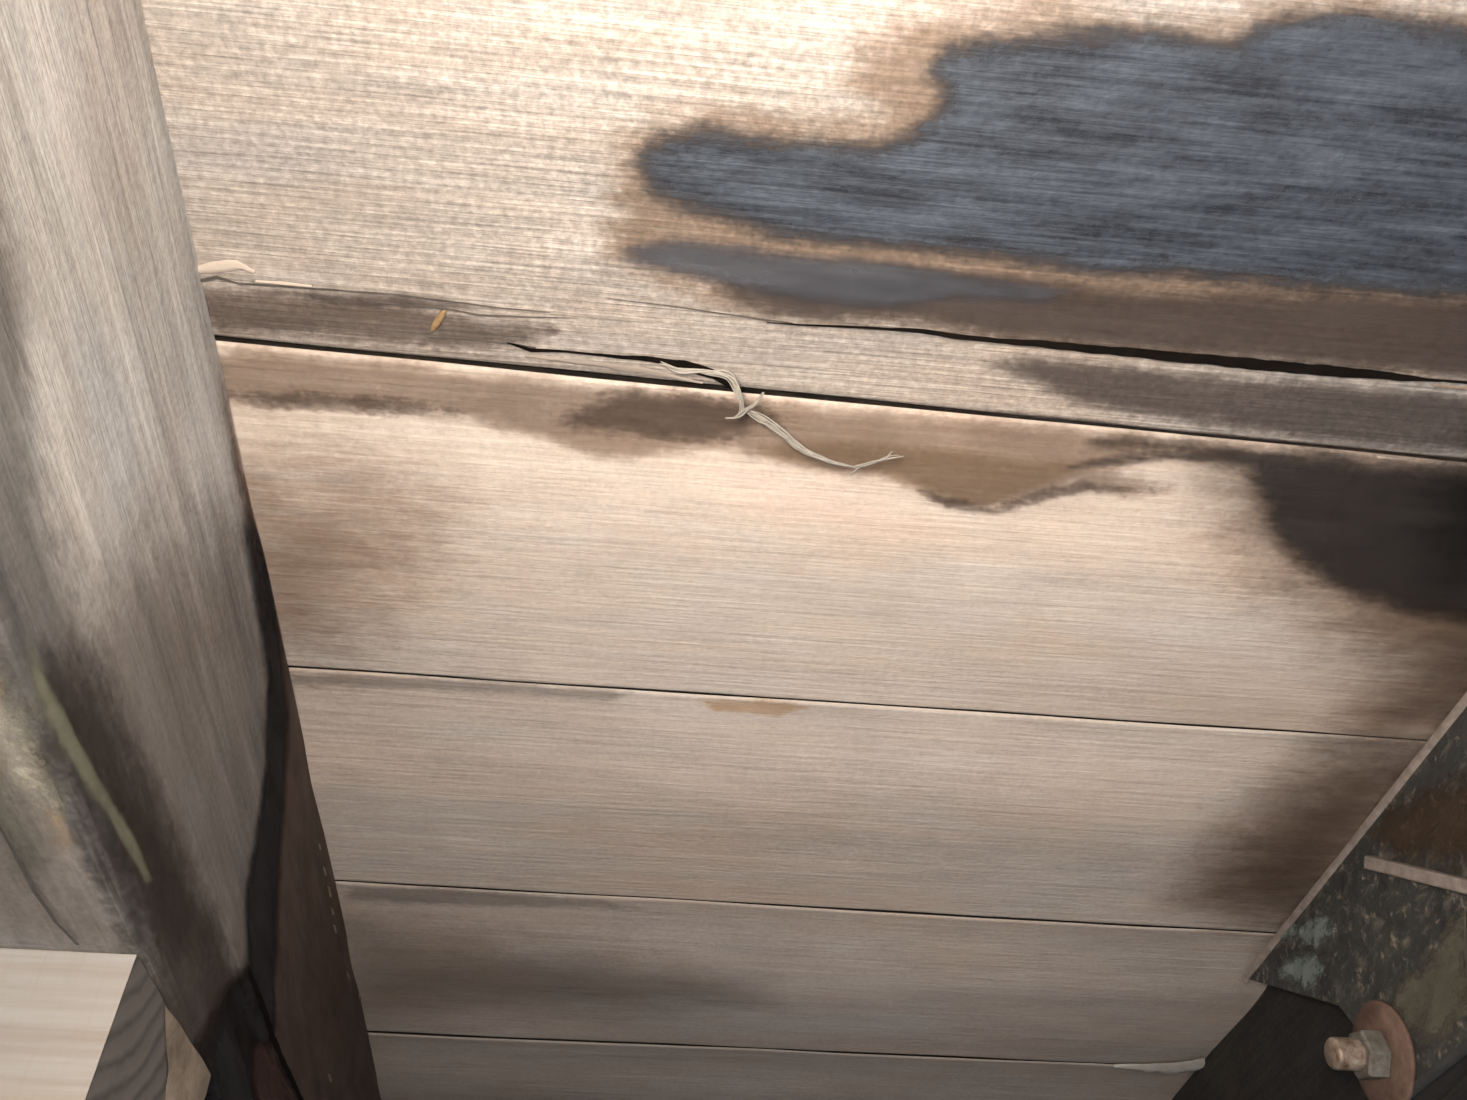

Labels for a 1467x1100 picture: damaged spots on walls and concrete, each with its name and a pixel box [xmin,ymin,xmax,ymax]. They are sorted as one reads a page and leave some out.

water stain [641,16,1467,293]
crack [200,276,761,394]
water stain [643,247,1013,312]
crack [608,298,1467,389]
water stain [1257,458,1467,688]
water stain [163,528,381,1100]
crack [0,826,79,945]